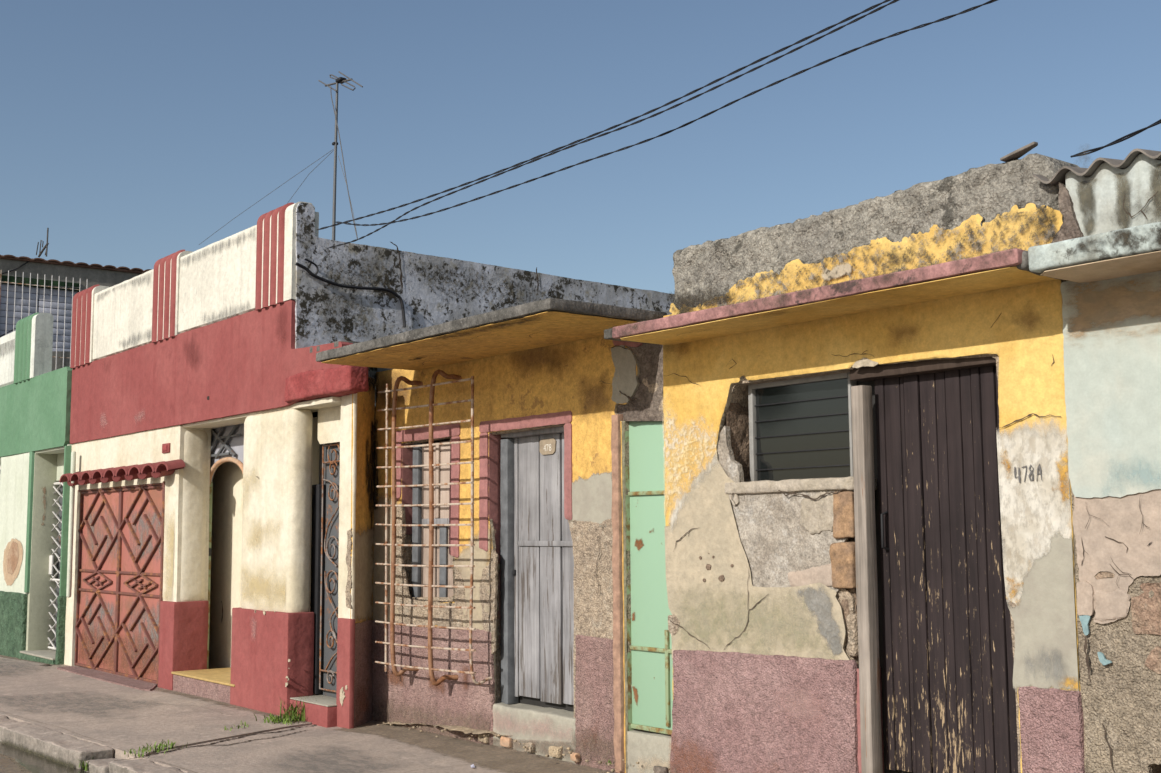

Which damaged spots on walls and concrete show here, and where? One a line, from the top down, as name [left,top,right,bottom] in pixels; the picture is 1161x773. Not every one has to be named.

water stain [318,252,391,340]
water stain [414,262,559,301]
peeling [668,203,1064,316]
water stain [1051,163,1161,250]
spalling [611,340,664,421]
spalling [568,472,613,641]
peeling [665,426,859,668]
peeling [996,420,1115,691]